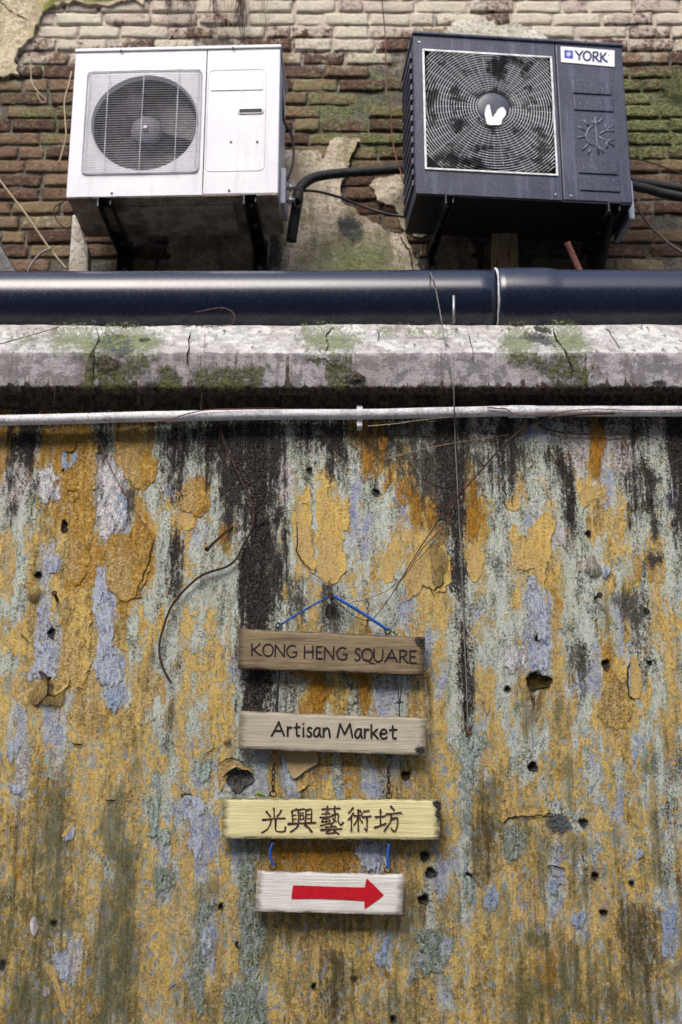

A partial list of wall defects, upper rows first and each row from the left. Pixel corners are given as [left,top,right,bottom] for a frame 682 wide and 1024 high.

peeling [485,105,506,125]
crack [89,329,100,384]
leakage [94,331,150,376]
leakage [524,324,556,346]
crack [553,328,573,377]
peeling [26,435,158,714]
peeling [296,467,350,585]
leakage [157,398,578,744]
peeling [502,511,555,691]
peeling [177,758,254,864]
crack [506,813,564,821]
peeling [189,839,269,1024]